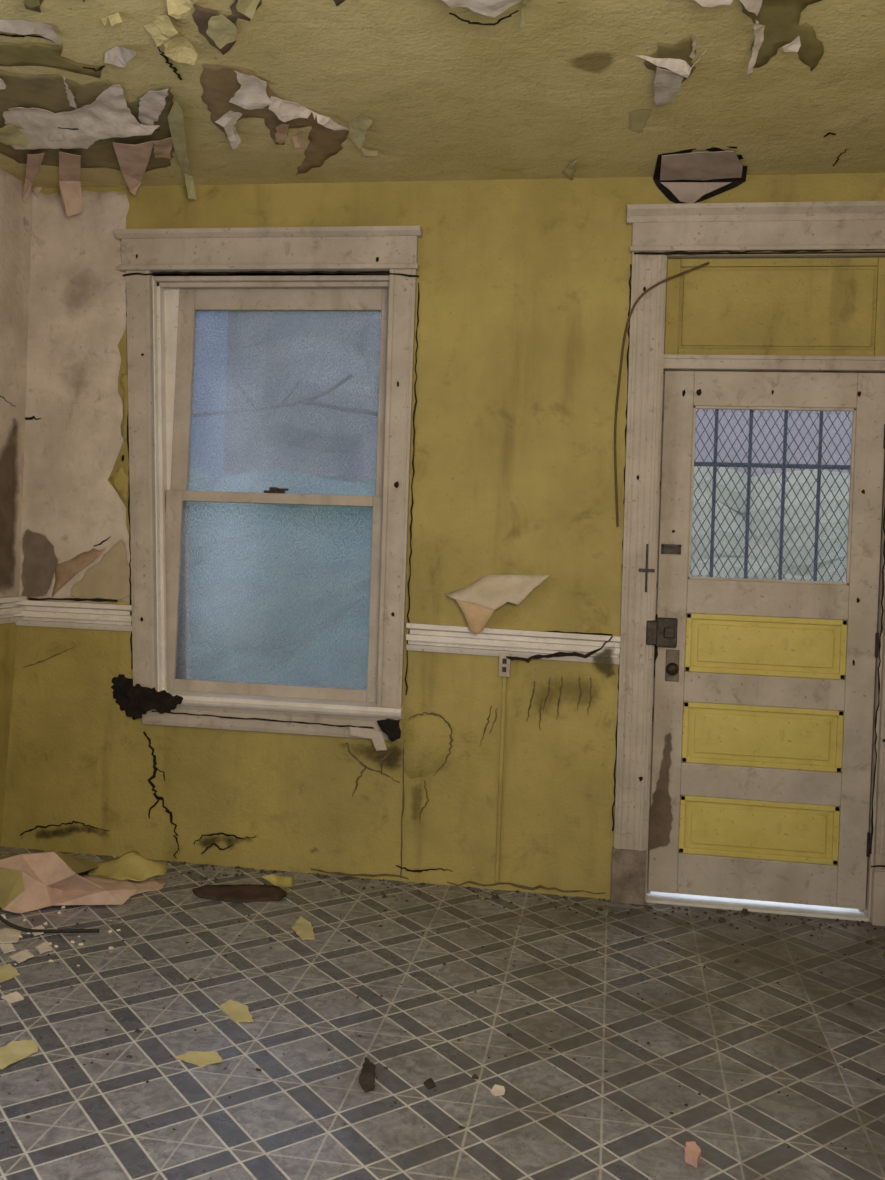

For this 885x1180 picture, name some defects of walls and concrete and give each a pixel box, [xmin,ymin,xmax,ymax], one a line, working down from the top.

peeling [442,0,531,29]
peeling [630,32,707,132]
peeling [695,0,824,80]
spalling [653,146,747,204]
flaking render [0,0,378,606]
crack [123,271,420,695]
crack [23,415,133,669]
peeling [445,574,552,634]
crack [143,710,374,859]